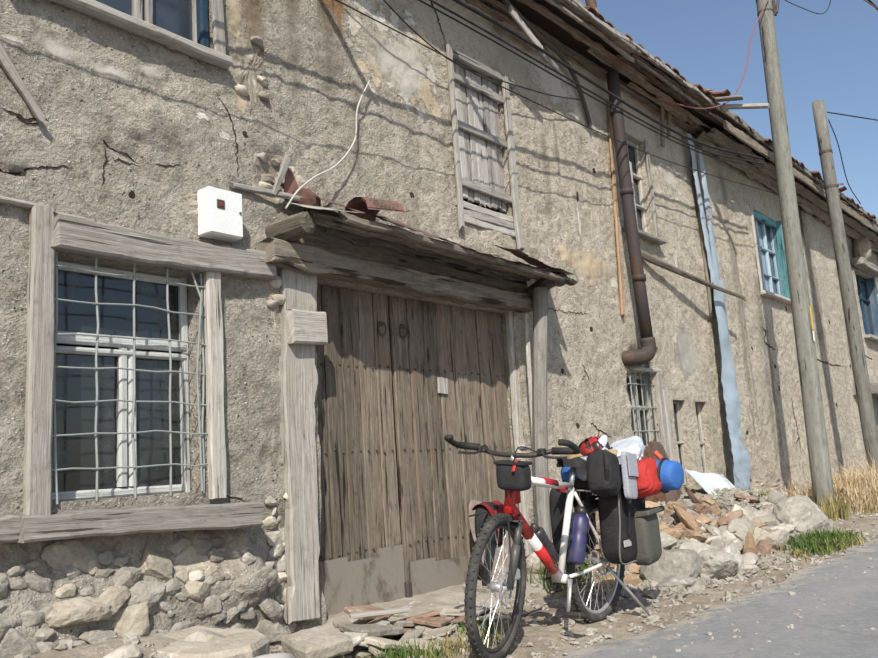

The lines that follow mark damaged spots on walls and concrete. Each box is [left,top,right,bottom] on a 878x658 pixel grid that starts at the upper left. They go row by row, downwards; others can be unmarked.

peeling [347,0,441,127]
crack [3,108,39,125]
crack [215,91,239,174]
crack [0,165,71,176]
crack [102,139,181,184]